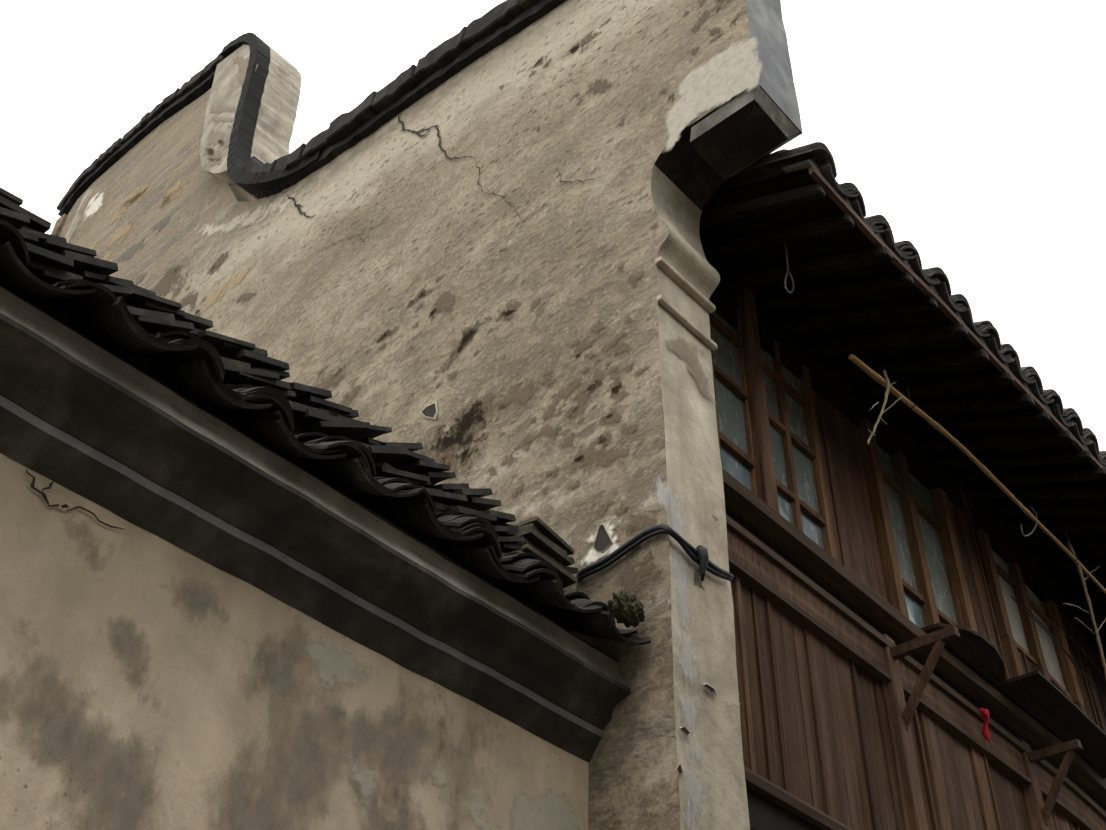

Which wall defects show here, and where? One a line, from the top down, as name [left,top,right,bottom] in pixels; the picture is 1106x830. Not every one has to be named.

crack [287,196,316,218]
crack [398,113,596,221]
leakage [316,366,361,407]
leakage [414,312,649,495]
crack [26,469,125,530]
flaking render [581,522,619,565]
leakage [25,679,149,830]
leakage [221,642,444,830]